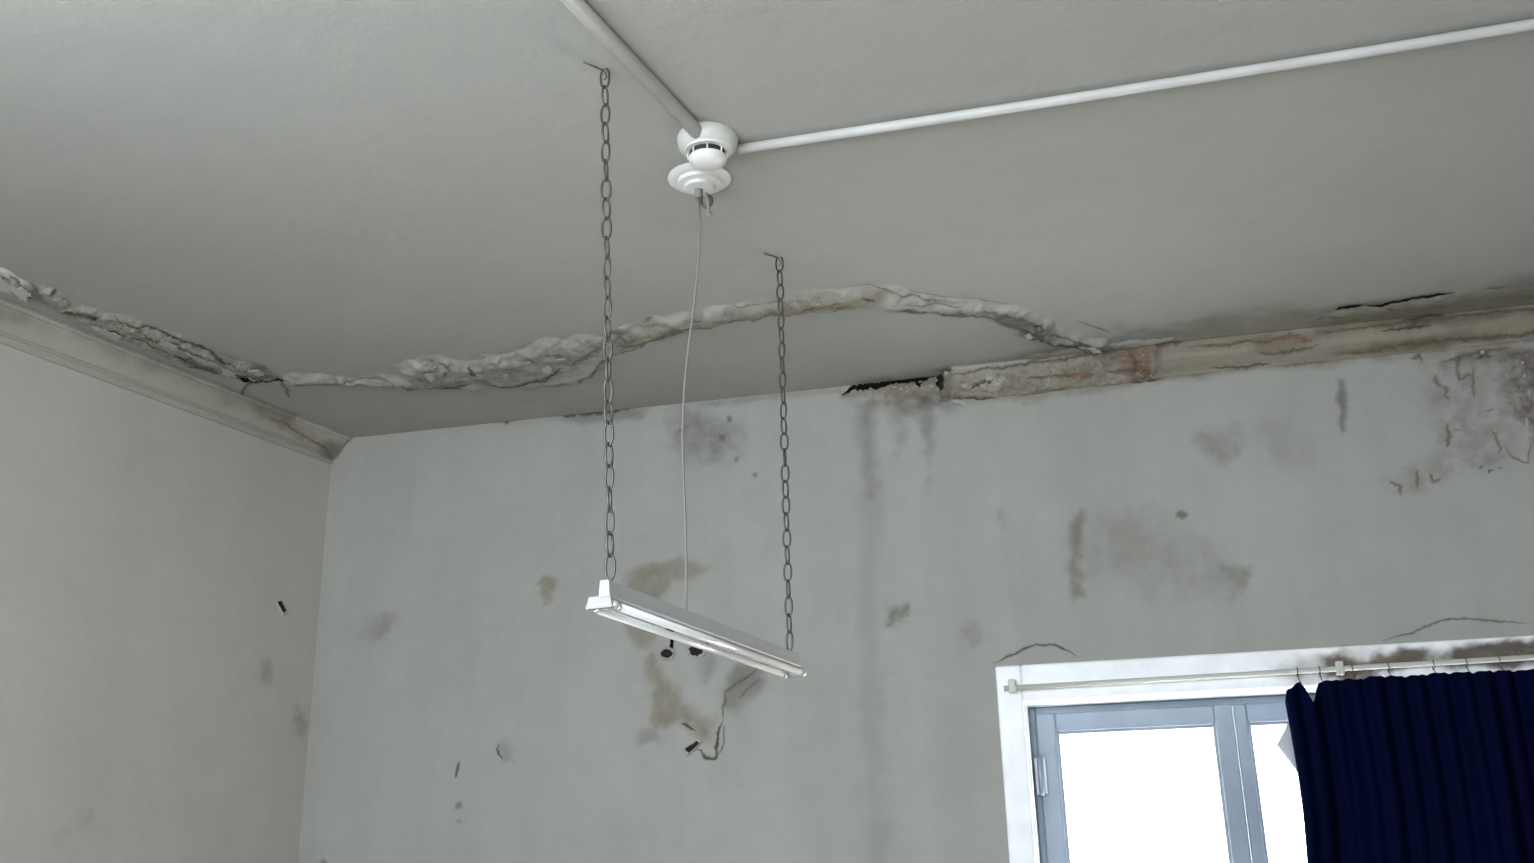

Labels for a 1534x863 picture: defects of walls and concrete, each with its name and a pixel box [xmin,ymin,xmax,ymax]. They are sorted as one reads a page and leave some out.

peeling [0,267,33,303]
crack [32,282,1110,423]
spalling [846,335,1184,408]